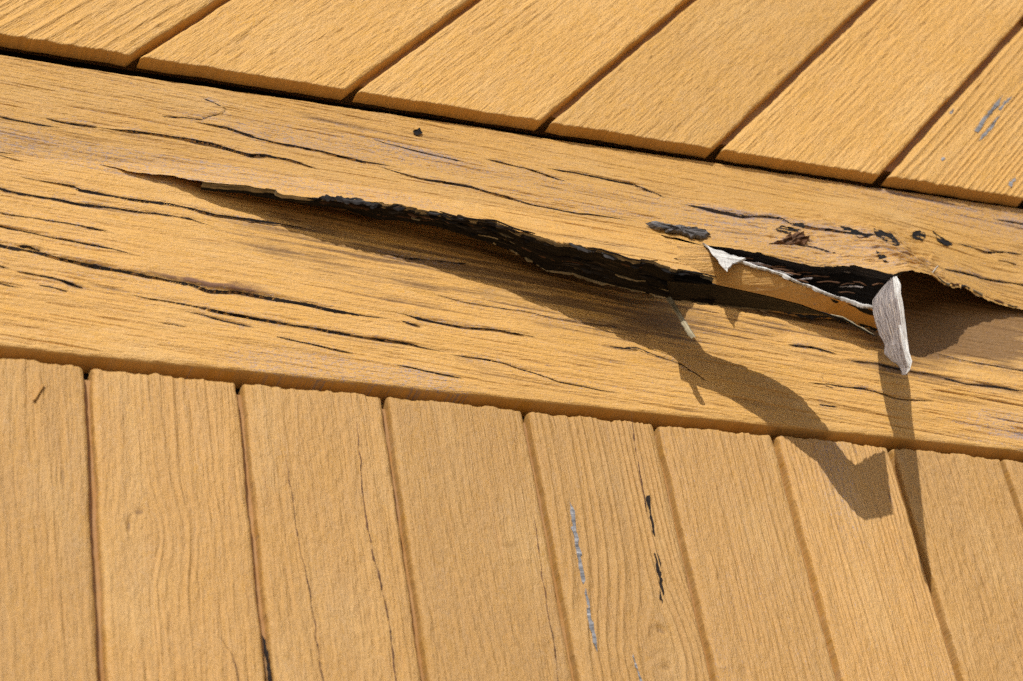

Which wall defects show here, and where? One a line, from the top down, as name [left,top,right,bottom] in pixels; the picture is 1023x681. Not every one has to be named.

crack [0,155,703,393]
spalling [697,244,904,316]
peeling [569,500,597,650]